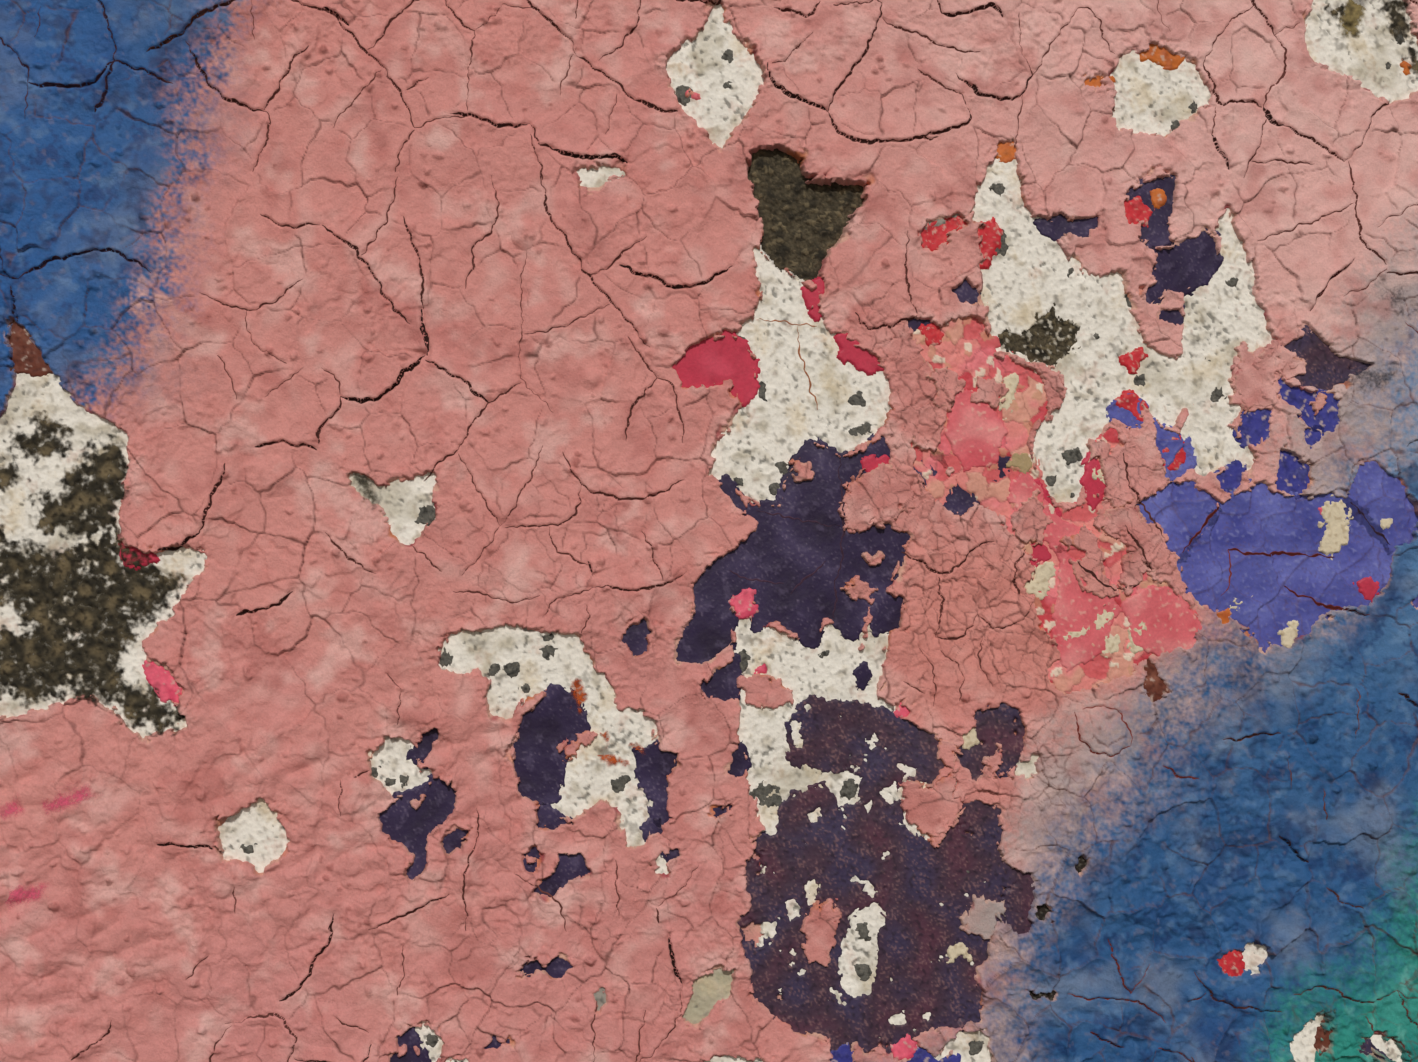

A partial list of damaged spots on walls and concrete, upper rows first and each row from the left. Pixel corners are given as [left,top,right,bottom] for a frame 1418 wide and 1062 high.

crack [0,0,309,171]
peeling [666,4,764,148]
crack [767,0,1115,148]
crack [1203,0,1418,311]
peeling [1305,0,1418,103]
crack [201,0,732,635]
peeling [0,320,207,738]
peeling [672,141,1418,1062]
crack [1078,453,1370,616]
peeling [368,728,468,880]
peeling [438,619,678,847]
crack [209,914,334,1062]